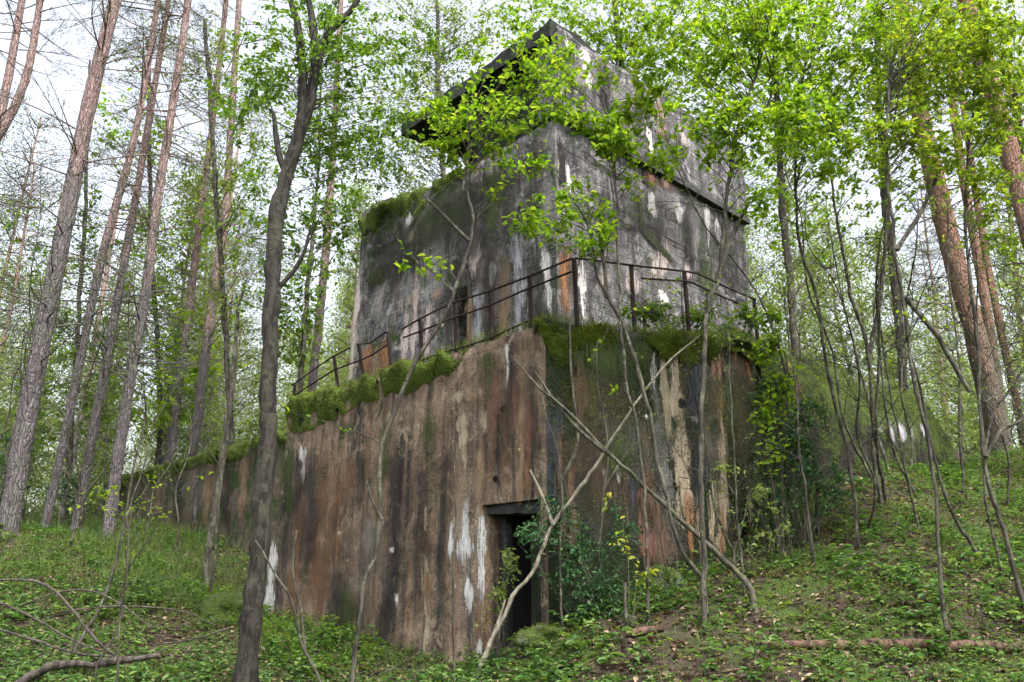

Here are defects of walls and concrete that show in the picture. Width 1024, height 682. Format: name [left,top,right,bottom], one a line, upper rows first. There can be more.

corrosion [358,342,389,376]
damp [400,275,419,361]
damp [449,148,553,414]
corrosion [558,251,587,321]
damp [352,407,487,651]